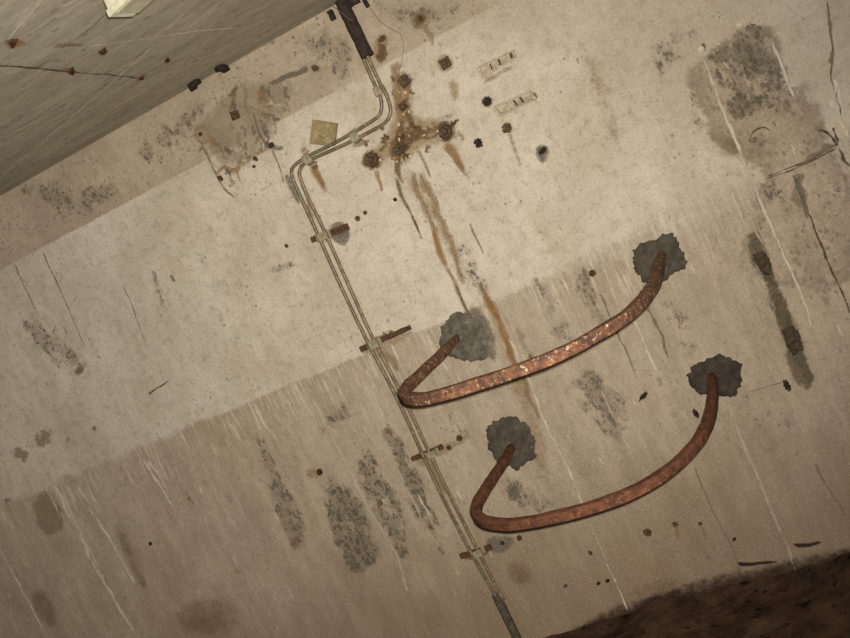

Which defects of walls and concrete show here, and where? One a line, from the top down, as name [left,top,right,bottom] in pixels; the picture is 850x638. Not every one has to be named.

crack [0,60,137,79]
water stain [140,69,307,197]
rust [354,65,472,318]
crack [767,4,850,313]
water stain [24,321,80,368]
rust [480,285,516,364]
water stain [259,441,306,546]
water stain [325,424,439,573]